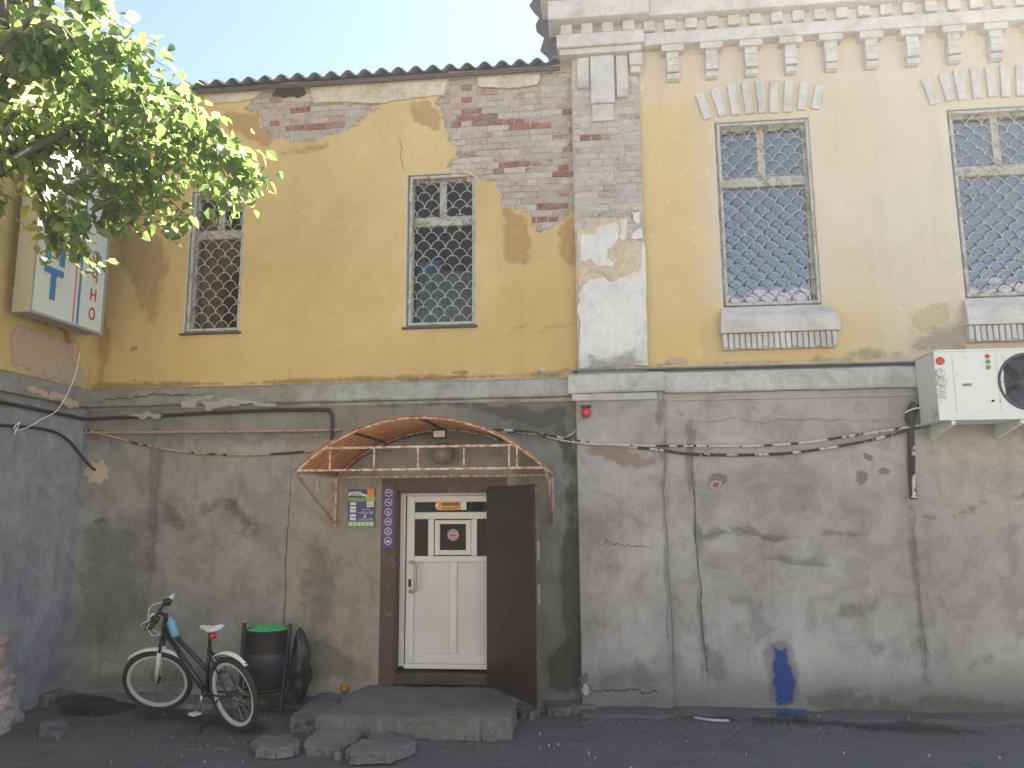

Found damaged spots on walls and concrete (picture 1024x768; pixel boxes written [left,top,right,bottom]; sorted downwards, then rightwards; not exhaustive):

flaking render [243,82,381,144]
flaking render [433,64,644,295]
damp [559,223,575,264]
flaking render [11,326,84,409]
peeling [129,411,162,419]
crack [88,371,212,403]
peeling [181,395,276,411]
crack [591,417,904,695]
crack [911,500,931,680]